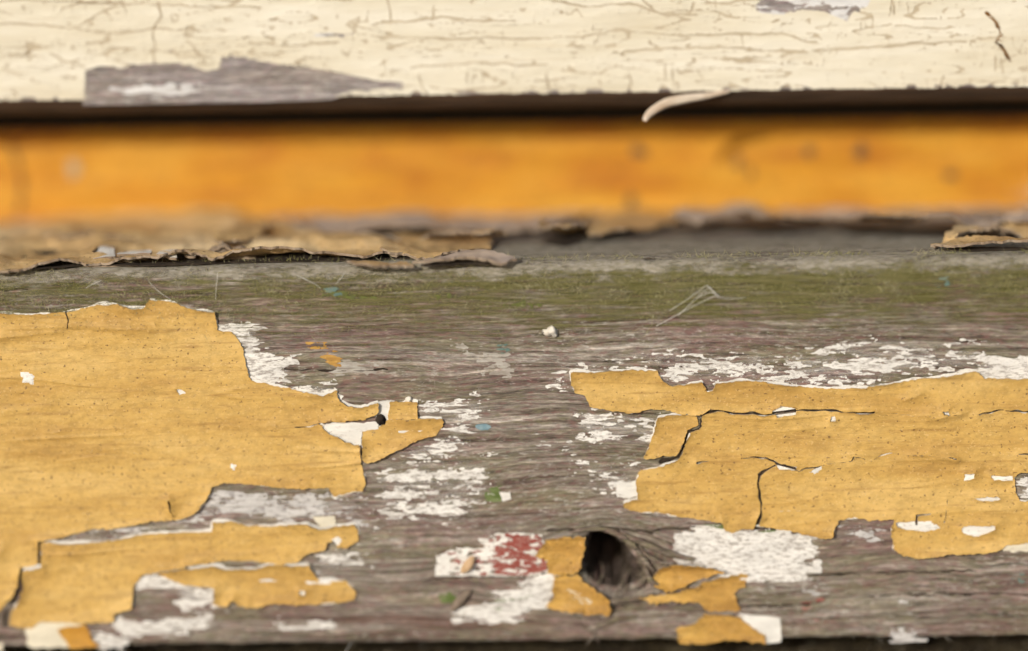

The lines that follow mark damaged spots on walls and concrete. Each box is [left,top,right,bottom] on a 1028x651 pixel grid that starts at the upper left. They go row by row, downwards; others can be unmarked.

crack [45,0,124,8]
peeling [754,0,870,21]
crack [985,11,1010,61]
peeling [82,54,405,106]
peeling [0,203,1028,273]
peeling [0,298,444,649]
peeling [569,368,1028,559]
peeling [435,531,782,645]